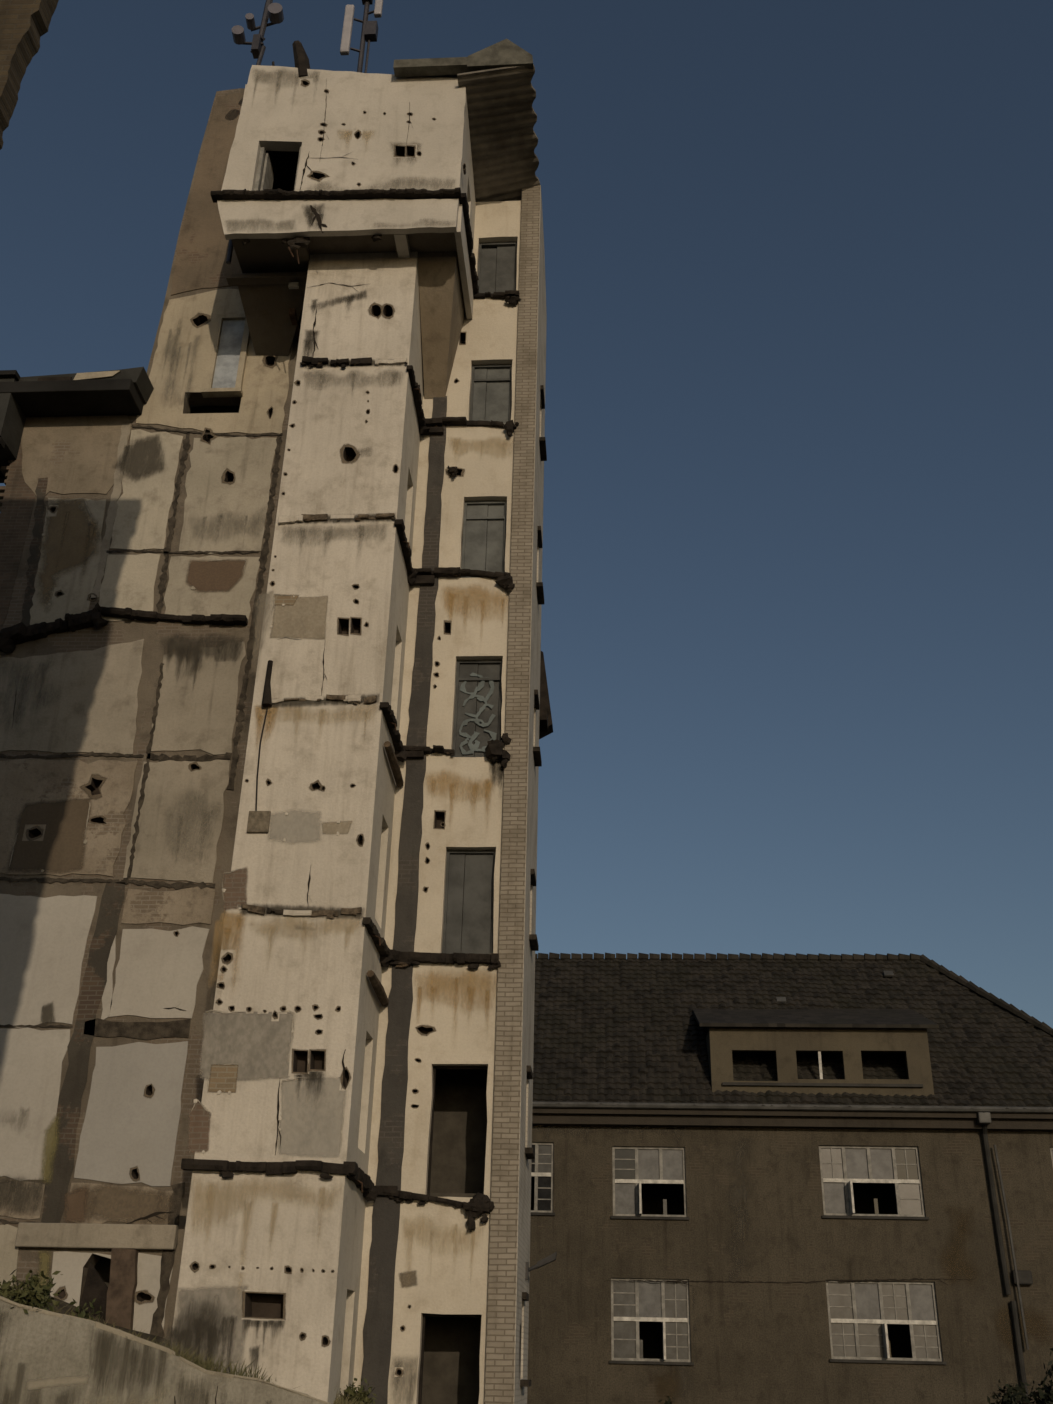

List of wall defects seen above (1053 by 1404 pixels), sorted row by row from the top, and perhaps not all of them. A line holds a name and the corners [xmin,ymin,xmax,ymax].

water stain [166,635,242,682]